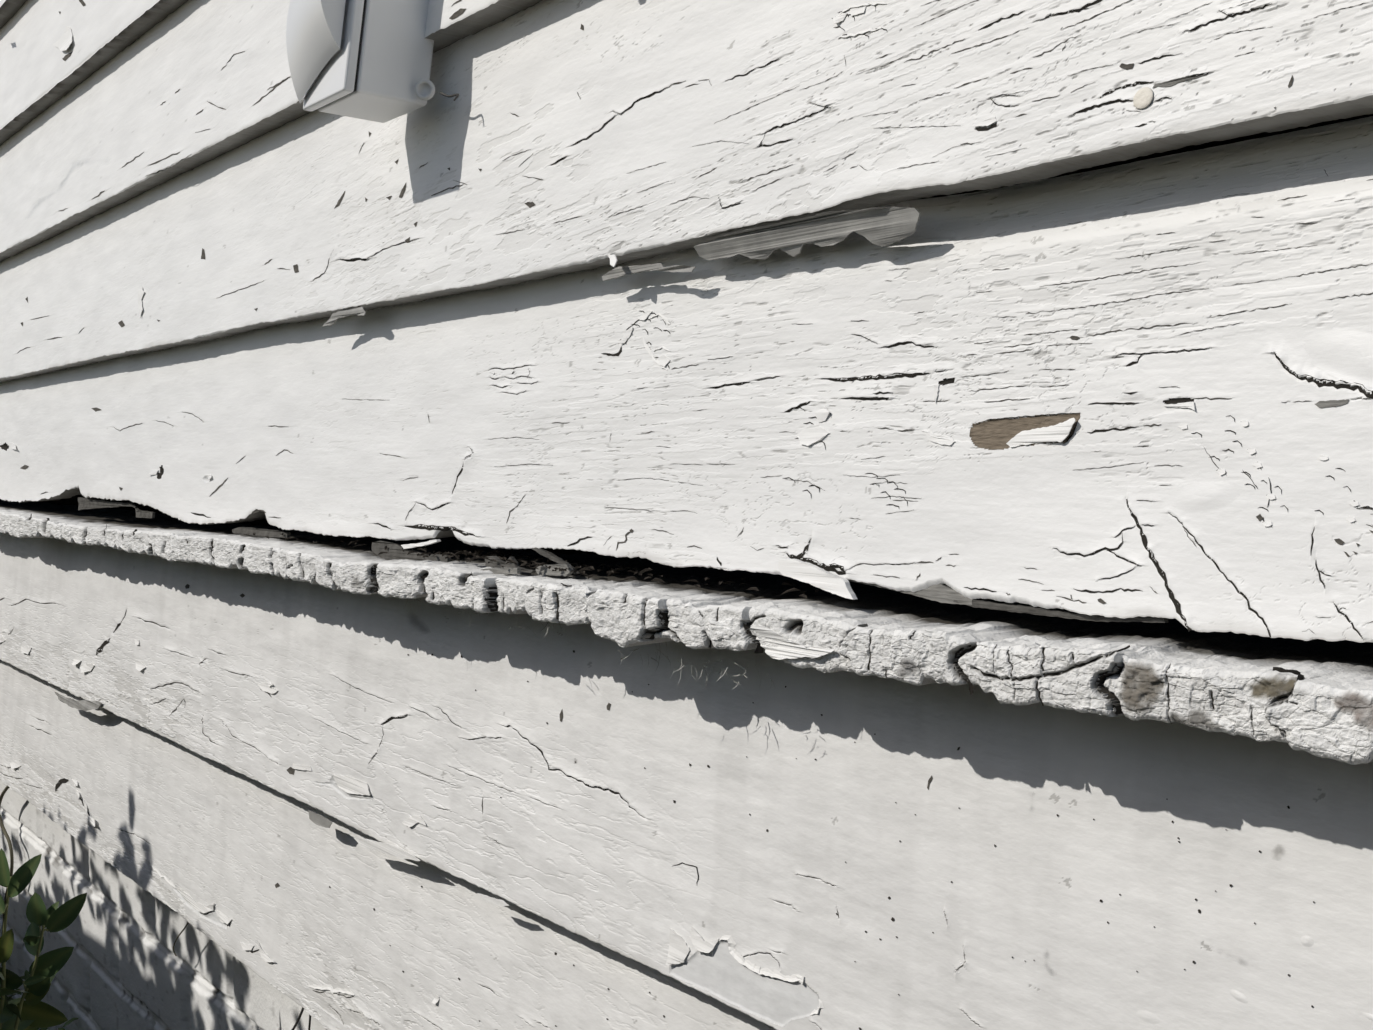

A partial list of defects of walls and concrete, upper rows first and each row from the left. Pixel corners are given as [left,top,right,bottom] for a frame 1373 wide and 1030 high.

crack [503,0,1282,216]
crack [218,238,419,298]
crack [374,422,570,536]
crack [540,170,1373,747]
peeling [922,413,1080,450]
peeling [1318,455,1372,523]
peeling [55,692,102,711]
crack [96,612,278,764]
crack [465,572,507,614]
peeling [749,625,834,660]
crack [316,678,643,844]
peeling [666,926,825,1027]